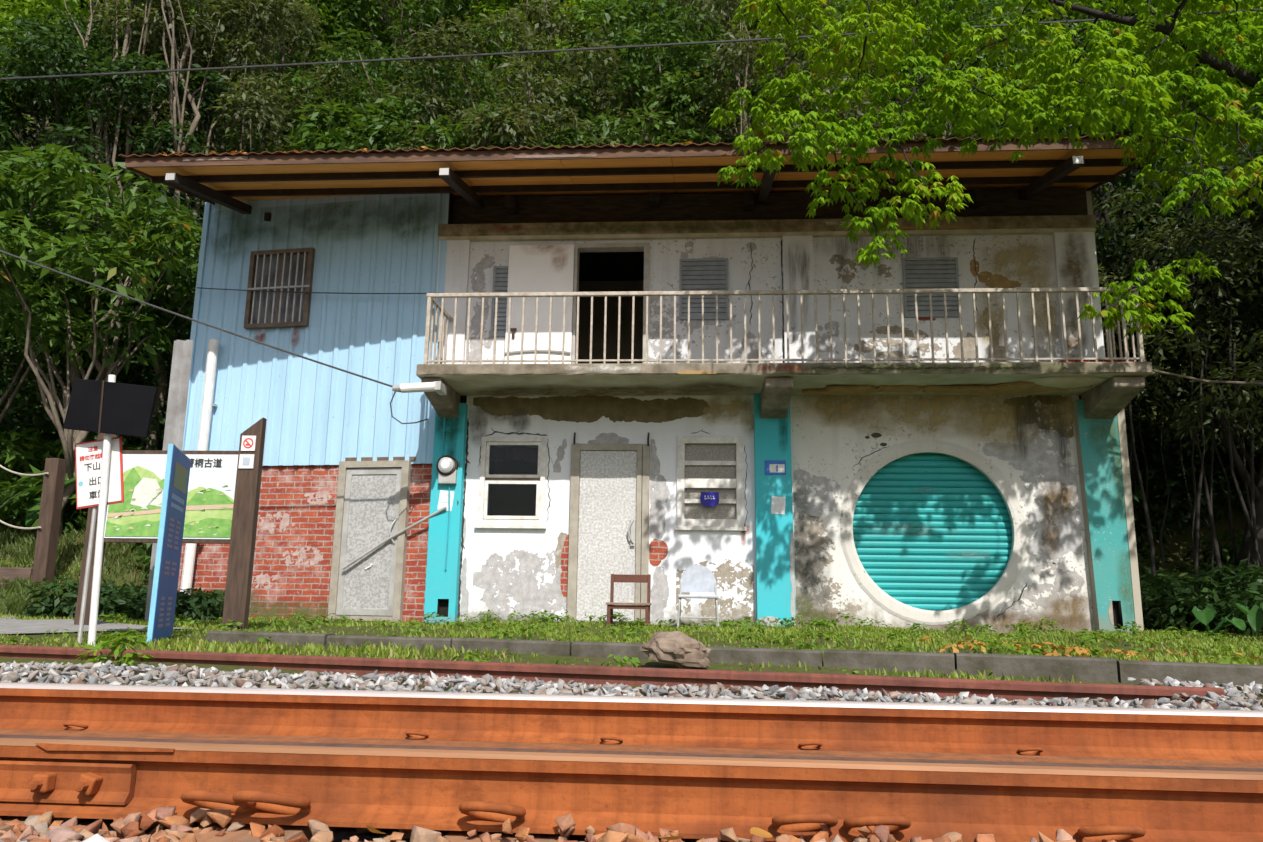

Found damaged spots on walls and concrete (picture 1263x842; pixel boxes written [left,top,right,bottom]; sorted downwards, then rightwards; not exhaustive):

peeling [829,254,892,284]
peeling [468,254,495,364]
peeling [854,308,1006,362]
water stain [995,241,1089,357]
spalling [473,396,709,444]
efflorescence [257,512,297,534]
efflorescence [304,490,332,505]
peeling [649,439,862,626]
water stain [250,545,324,600]
peeling [460,518,569,621]
water stain [793,499,835,625]
water stain [948,597,1085,631]